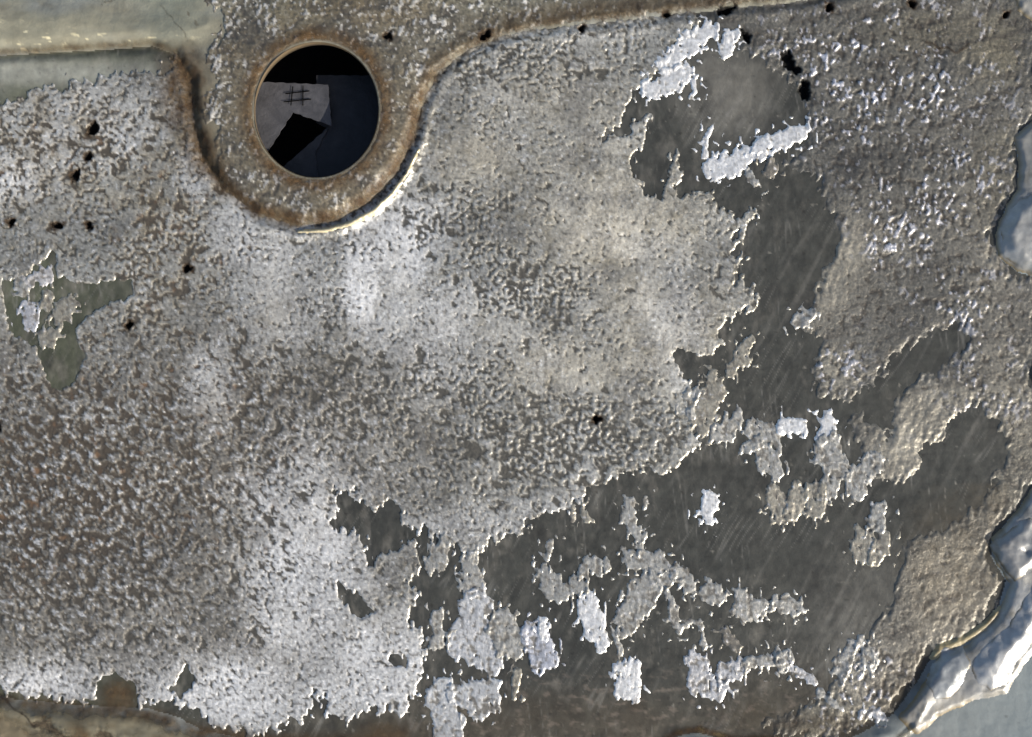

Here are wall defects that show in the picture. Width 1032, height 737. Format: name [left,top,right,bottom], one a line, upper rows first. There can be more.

peeling [630,14,746,107]
peeling [691,116,818,195]
rust [0,0,760,737]
peeling [675,327,901,572]
peeling [782,302,821,337]
rust [715,0,1032,737]
peeling [414,486,889,737]